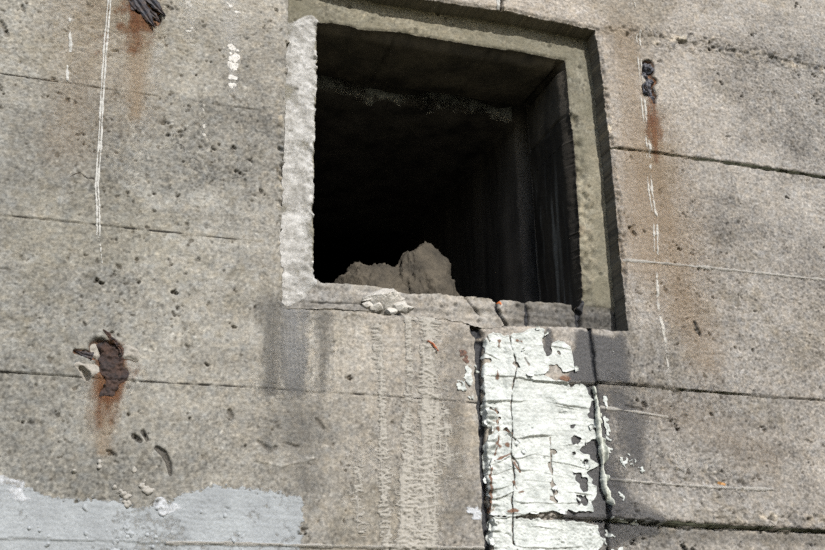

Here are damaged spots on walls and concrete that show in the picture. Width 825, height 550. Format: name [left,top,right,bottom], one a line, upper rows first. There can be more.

corrosion [648,99,662,145]
peeling [457,326,616,550]